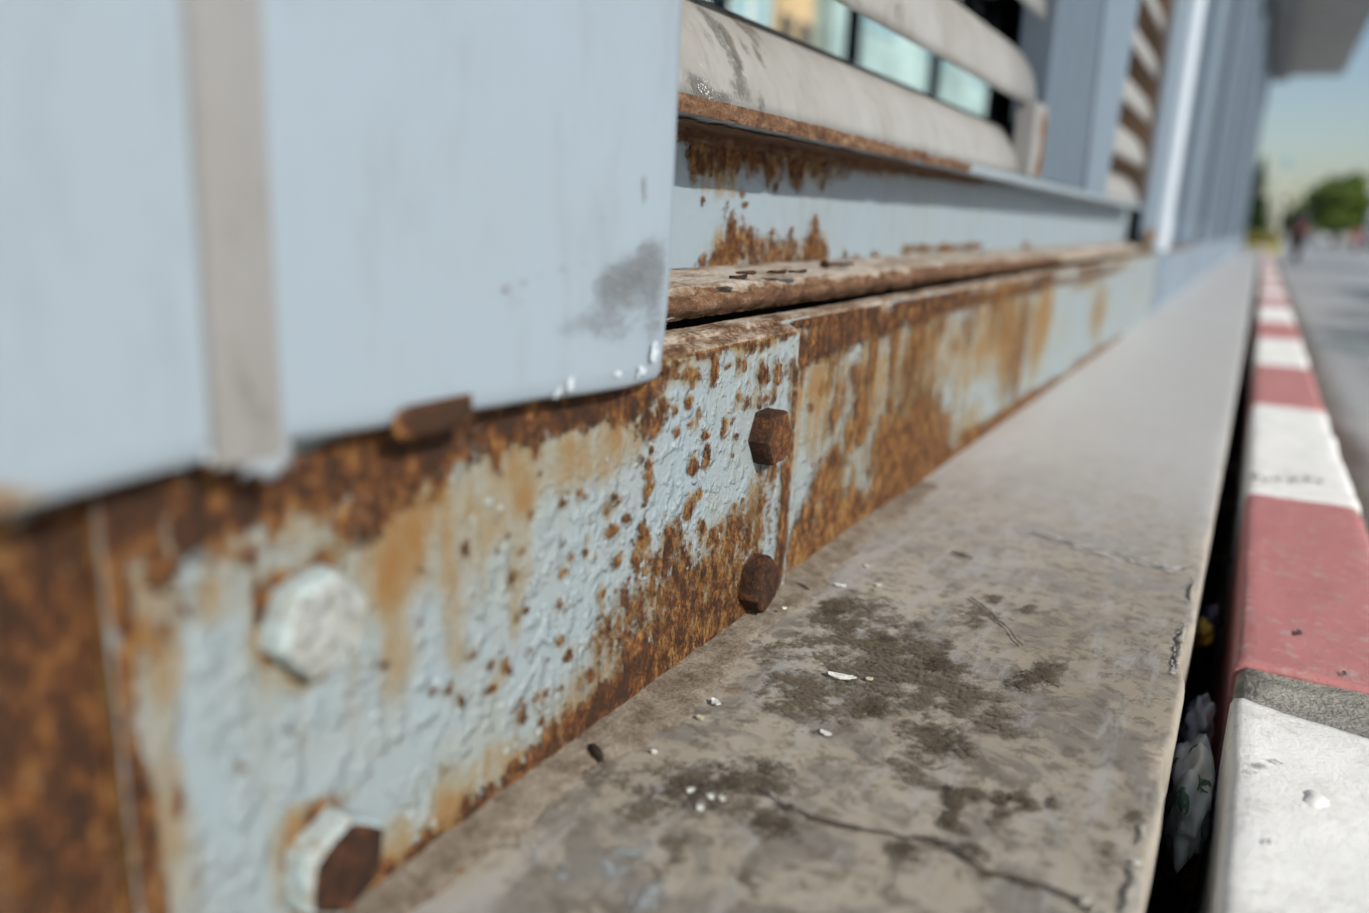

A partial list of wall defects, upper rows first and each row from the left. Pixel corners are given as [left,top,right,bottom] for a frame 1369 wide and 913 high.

spalling [553,376,575,398]
spalling [609,341,660,378]
rust [0,92,1126,913]
water stain [649,759,803,842]
water stain [938,786,1056,857]